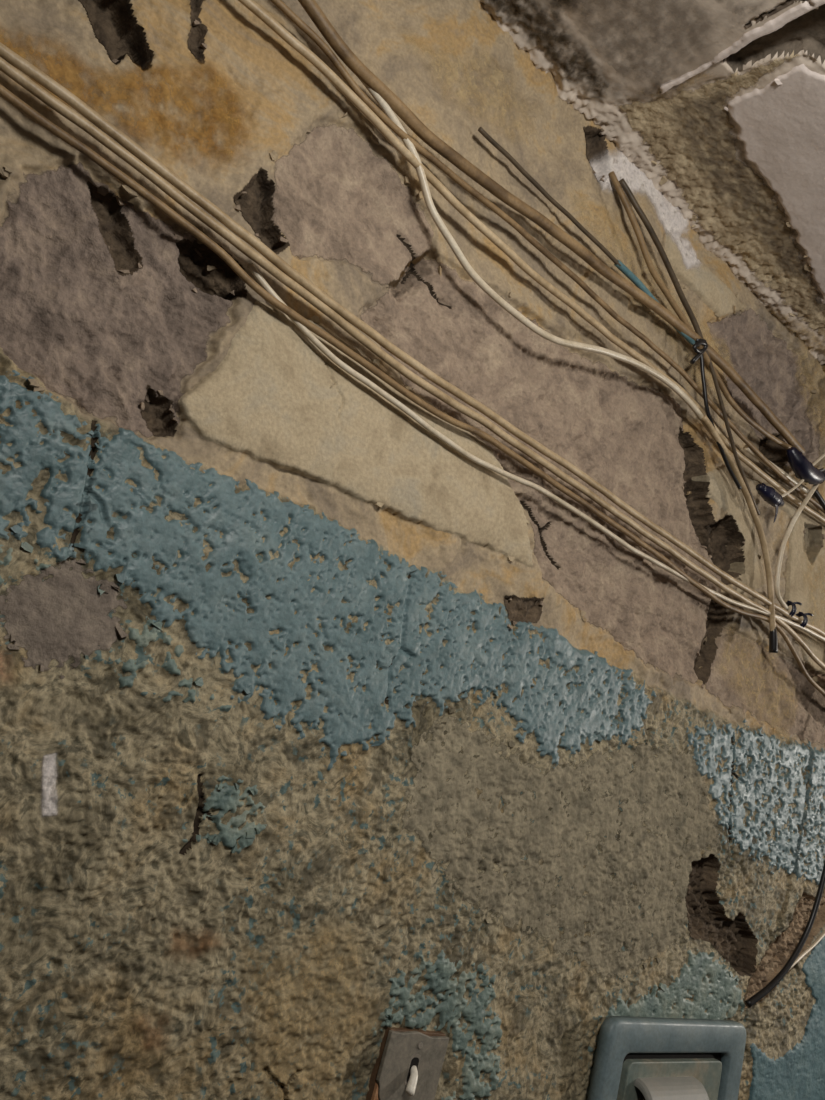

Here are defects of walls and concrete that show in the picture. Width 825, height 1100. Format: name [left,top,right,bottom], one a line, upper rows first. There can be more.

spalling [78,0,155,71]
spalling [188,0,208,64]
spalling [583,125,609,182]
peeling [724,64,825,303]
crack [396,235,452,309]
crack [87,420,99,477]
crack [66,513,82,561]
peeling [0,162,825,1021]
crack [179,774,213,855]
peeling [371,950,502,1100]
peeling [748,889,825,1100]